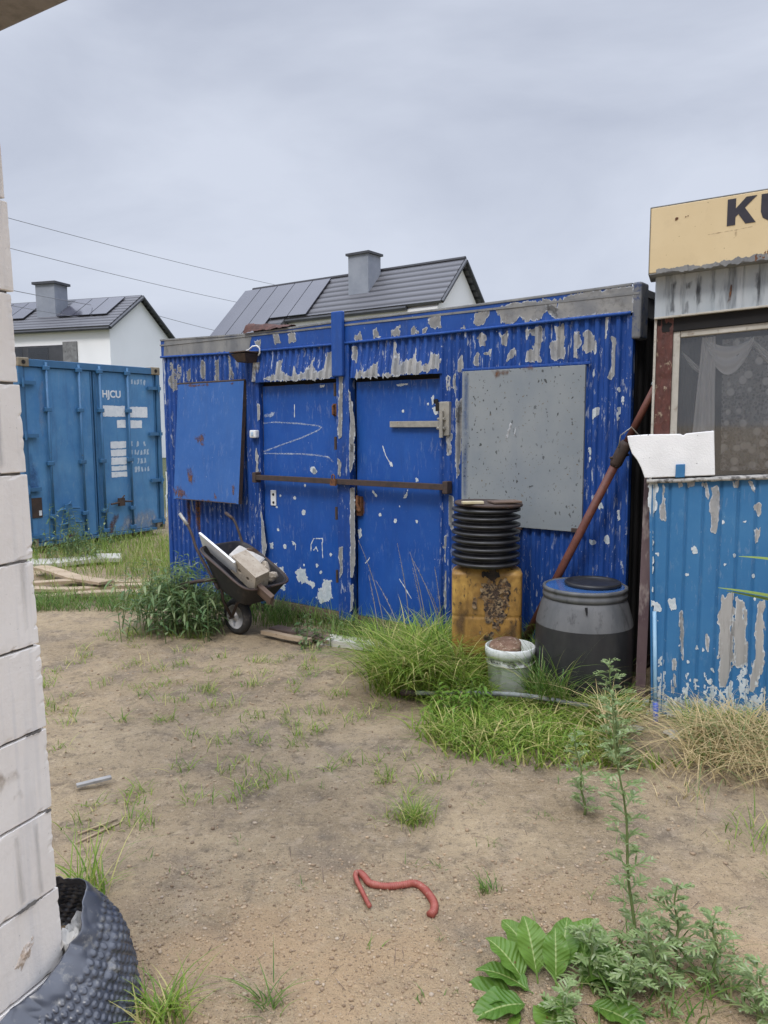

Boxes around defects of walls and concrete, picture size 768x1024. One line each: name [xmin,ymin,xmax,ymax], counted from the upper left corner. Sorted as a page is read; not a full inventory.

peeling [263,286,634,479]
peeling [260,487,362,612]
peeling [442,495,454,609]
peeling [648,483,666,521]
peeling [678,482,725,534]
peeling [733,480,762,544]
peeling [641,587,766,718]